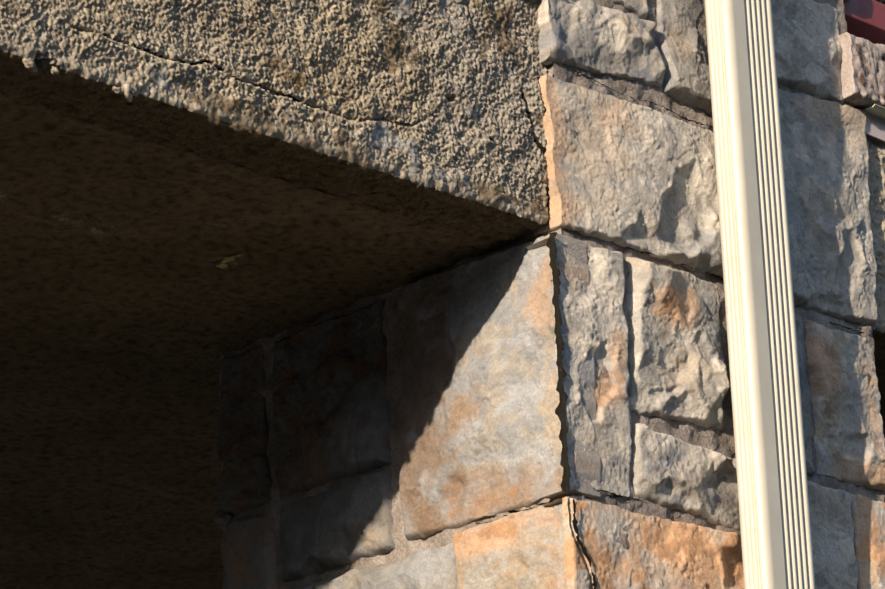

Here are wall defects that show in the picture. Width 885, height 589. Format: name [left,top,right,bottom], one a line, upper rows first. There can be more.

crack [77,28,433,127]
crack [564,64,713,128]
crack [611,241,724,281]
crack [475,73,597,589]
crack [592,488,644,502]